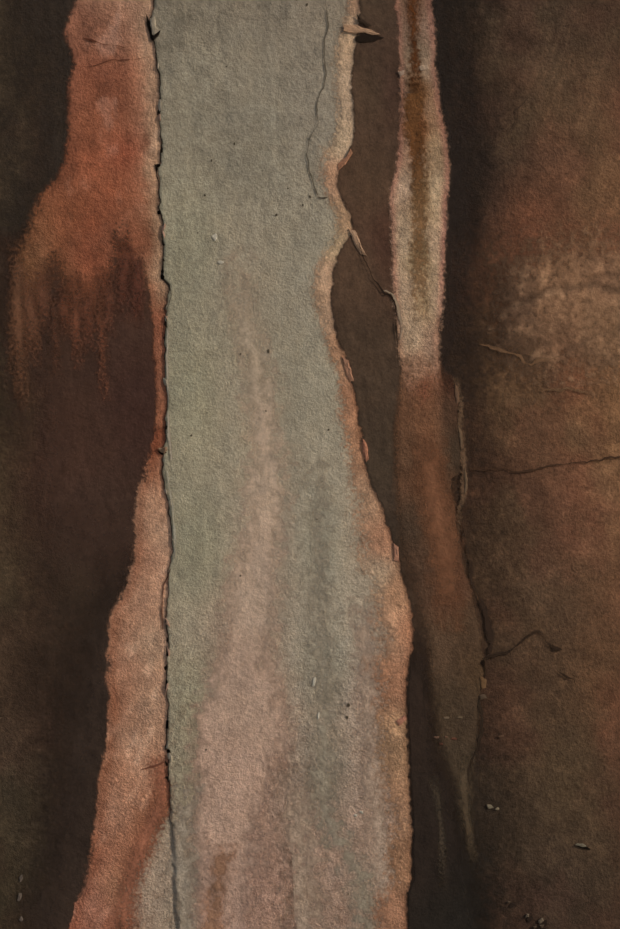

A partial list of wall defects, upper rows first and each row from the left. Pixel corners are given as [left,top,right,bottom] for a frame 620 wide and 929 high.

crack [306,0,329,199]
crack [356,242,403,350]
rust [389,0,451,401]
rust [8,0,173,929]
peeling [120,0,405,929]
crack [469,456,620,473]
crack [460,510,576,784]